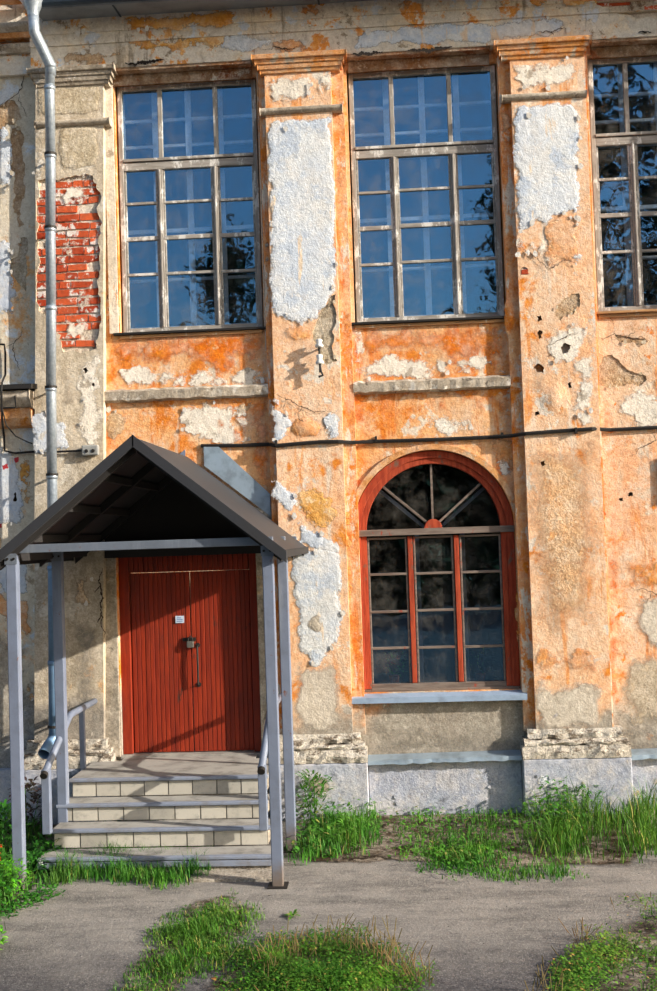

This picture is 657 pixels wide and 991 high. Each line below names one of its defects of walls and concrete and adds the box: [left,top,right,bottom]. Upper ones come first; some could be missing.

peeling [355,16,571,49]
peeling [514,56,576,91]
flaking render [563,0,657,19]
flaking render [0,100,127,454]
peeling [265,117,338,365]
peeling [512,102,584,275]
peeling [0,447,24,528]
peeling [271,481,346,667]